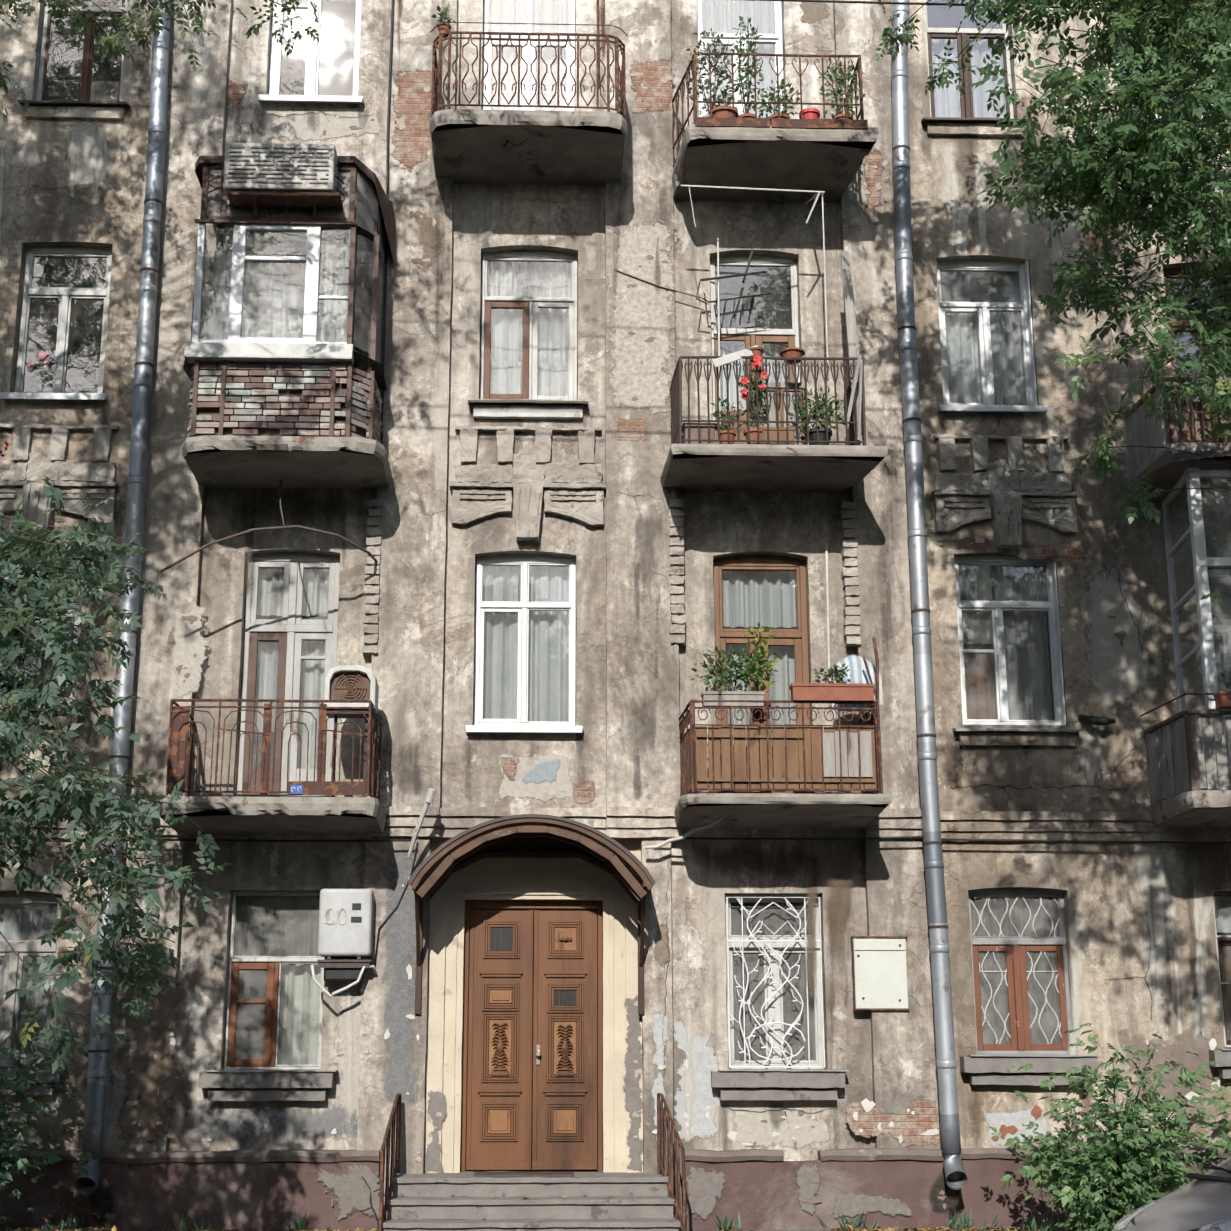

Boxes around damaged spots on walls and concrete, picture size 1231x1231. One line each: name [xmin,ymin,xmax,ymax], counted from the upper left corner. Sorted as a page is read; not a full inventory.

flaking render [227,79,248,108]
flaking render [254,69,432,172]
flaking render [629,58,675,114]
flaking render [167,606,209,698]
peeling [498,752,596,804]
flaking render [111,937,361,1147]
peeling [623,994,830,1172]
flaking render [845,1097,941,1147]
peeling [985,1104,1051,1147]